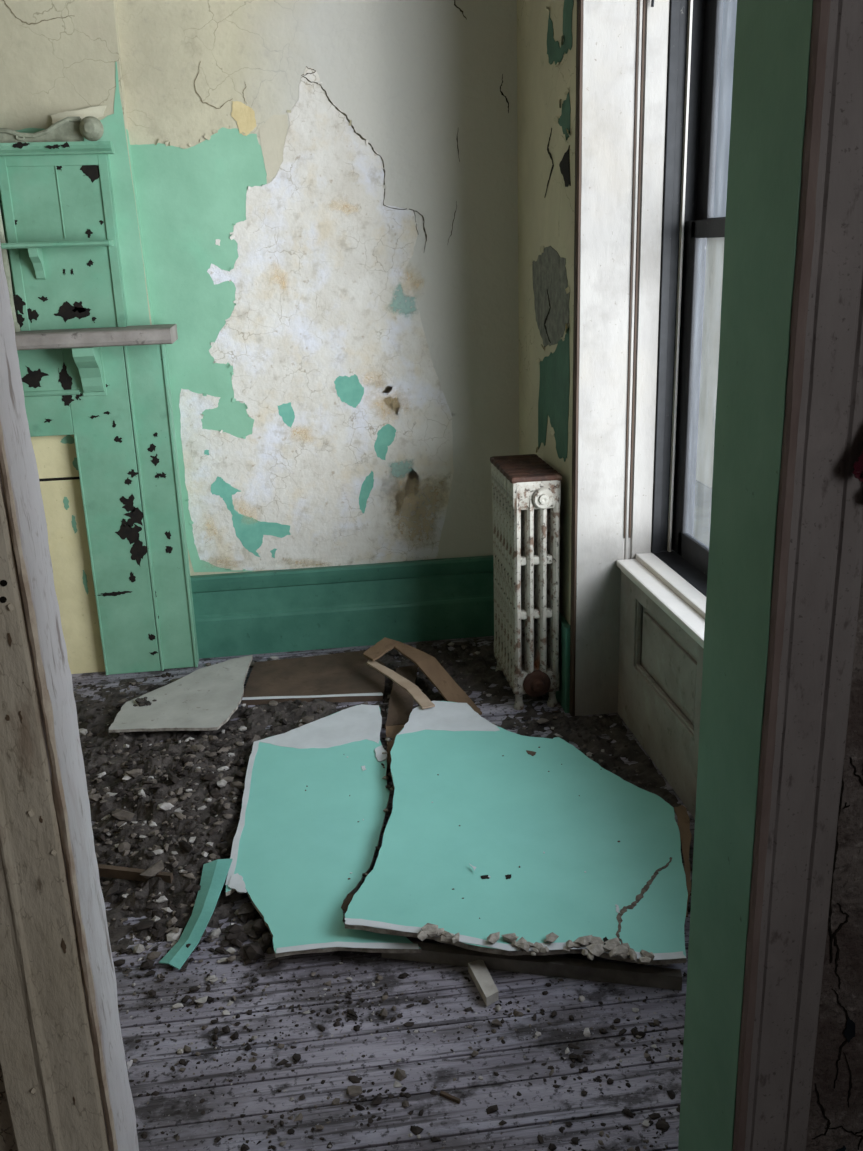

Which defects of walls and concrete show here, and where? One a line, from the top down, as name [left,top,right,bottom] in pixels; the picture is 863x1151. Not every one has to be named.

crack [3,0,72,25]
peeling [546,0,574,67]
peeling [554,88,571,187]
spalling [13,62,454,572]
peeling [529,246,570,462]
peeling [94,469,148,597]
crack [812,757,863,1150]